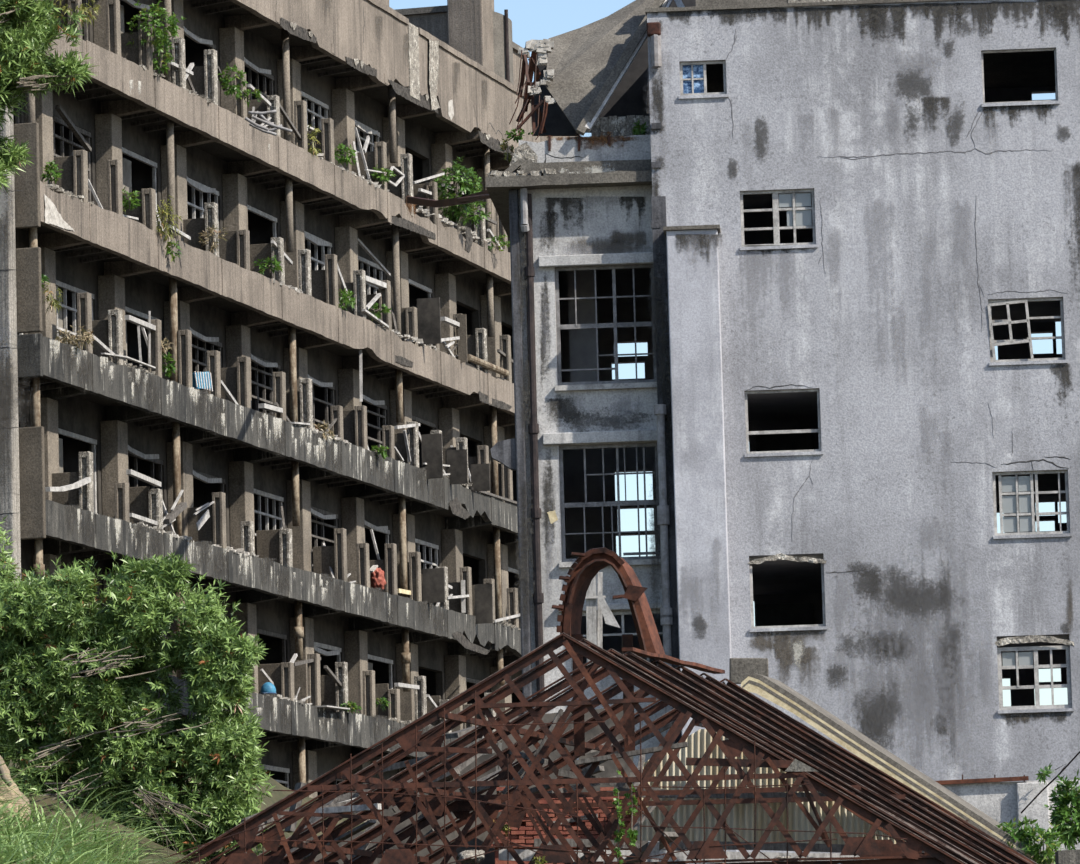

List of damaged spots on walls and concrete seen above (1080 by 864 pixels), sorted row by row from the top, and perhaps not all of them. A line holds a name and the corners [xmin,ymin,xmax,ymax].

leakage [652,72,664,132]
leakage [896,70,964,145]
crack [820,111,1053,160]
leakage [983,104,1052,127]
leakage [619,157,663,217]
leakage [540,198,672,616]
spalling [452,631,490,655]
leakage [849,561,960,747]